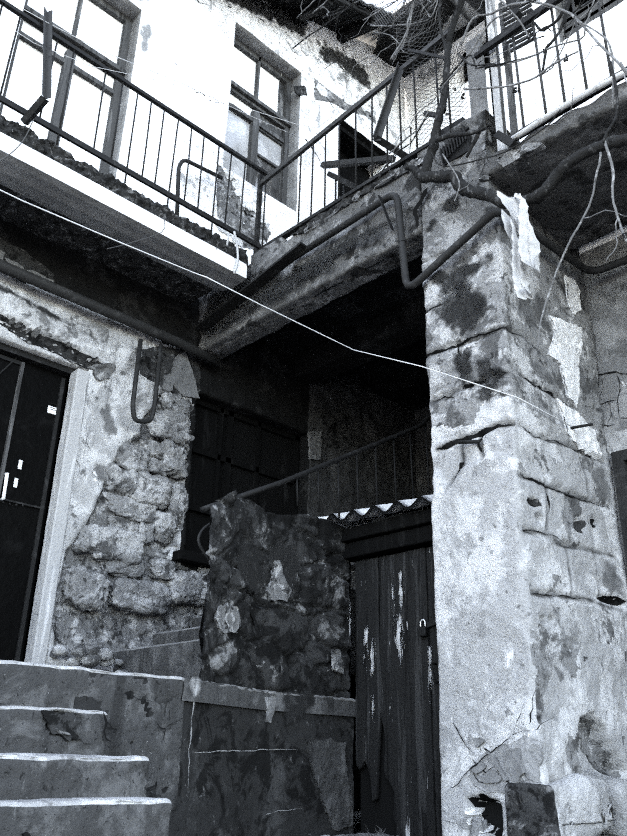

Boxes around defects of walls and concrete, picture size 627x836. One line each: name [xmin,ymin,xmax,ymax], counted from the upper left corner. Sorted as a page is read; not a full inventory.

damp [140,24,152,52]
peeling [294,78,376,124]
damp [431,253,493,336]
spalling [0,314,116,382]
damp [454,349,505,400]
crack [598,371,627,426]
spalling [41,710,82,741]
crack [450,687,554,789]
spalling [465,793,504,836]